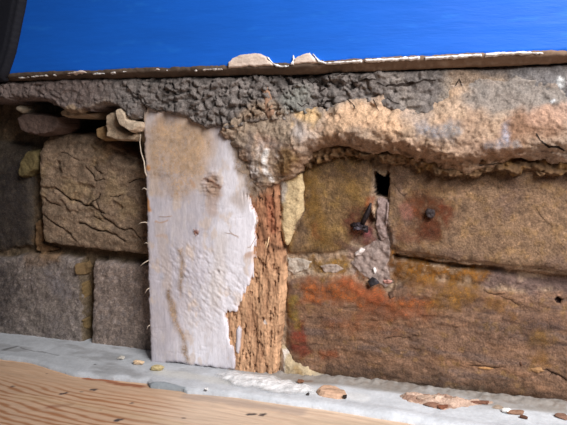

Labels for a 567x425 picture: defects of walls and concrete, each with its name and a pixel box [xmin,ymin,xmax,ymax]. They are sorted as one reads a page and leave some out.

crack [49,178,142,241]
rust [302,278,435,317]